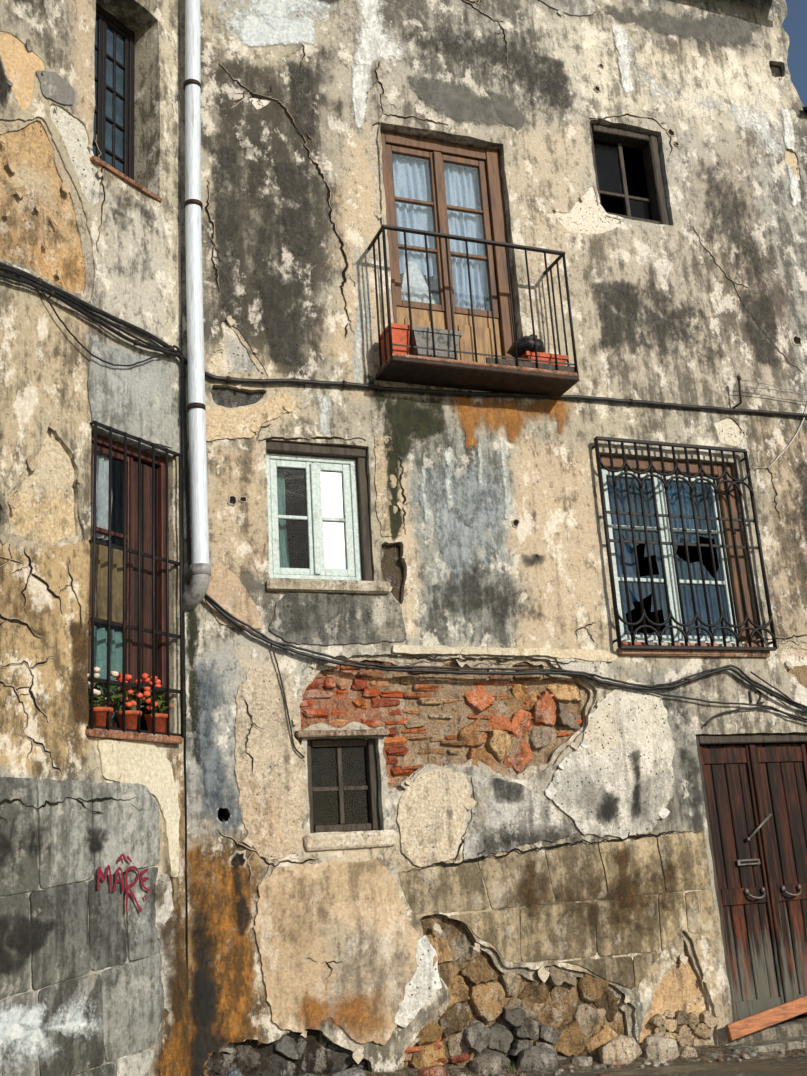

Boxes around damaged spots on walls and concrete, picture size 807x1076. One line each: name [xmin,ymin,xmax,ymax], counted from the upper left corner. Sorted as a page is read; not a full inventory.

crack [462,0,511,77]
flaking render [0,31,103,302]
crack [219,63,357,337]
water stain [593,281,720,363]
flaking render [381,544,407,603]
water stain [386,450,403,543]
water stain [412,440,545,624]
corrosion [452,395,570,448]
crack [0,544,145,821]
flaking render [292,654,599,792]
corrosion [160,846,258,1076]
flaking render [396,914,719,1070]